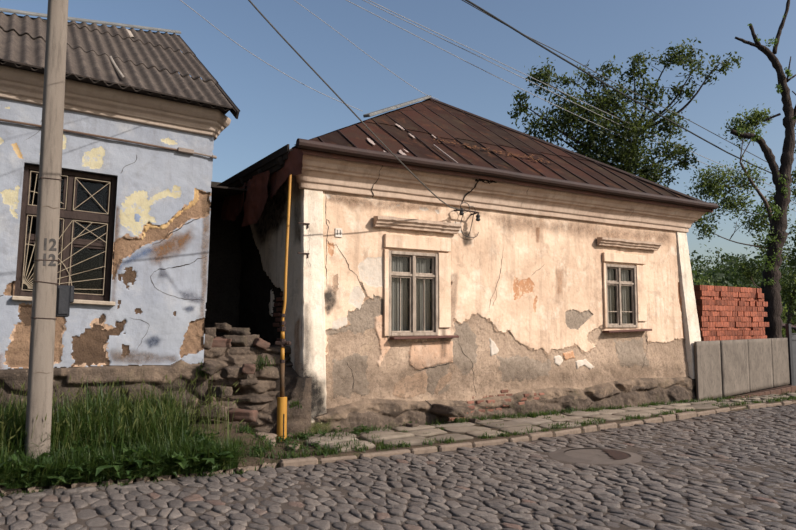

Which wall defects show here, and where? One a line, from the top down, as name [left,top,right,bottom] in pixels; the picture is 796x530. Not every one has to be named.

peeling [0,137,23,159]
peeling [0,186,20,219]
spalling [112,185,211,290]
crack [308,192,364,290]
spalling [3,281,15,296]
crack [150,256,207,300]
spalling [238,202,283,345]
spalling [3,303,32,369]
spalling [54,313,130,367]
spalling [179,317,205,358]
spalling [325,257,689,421]